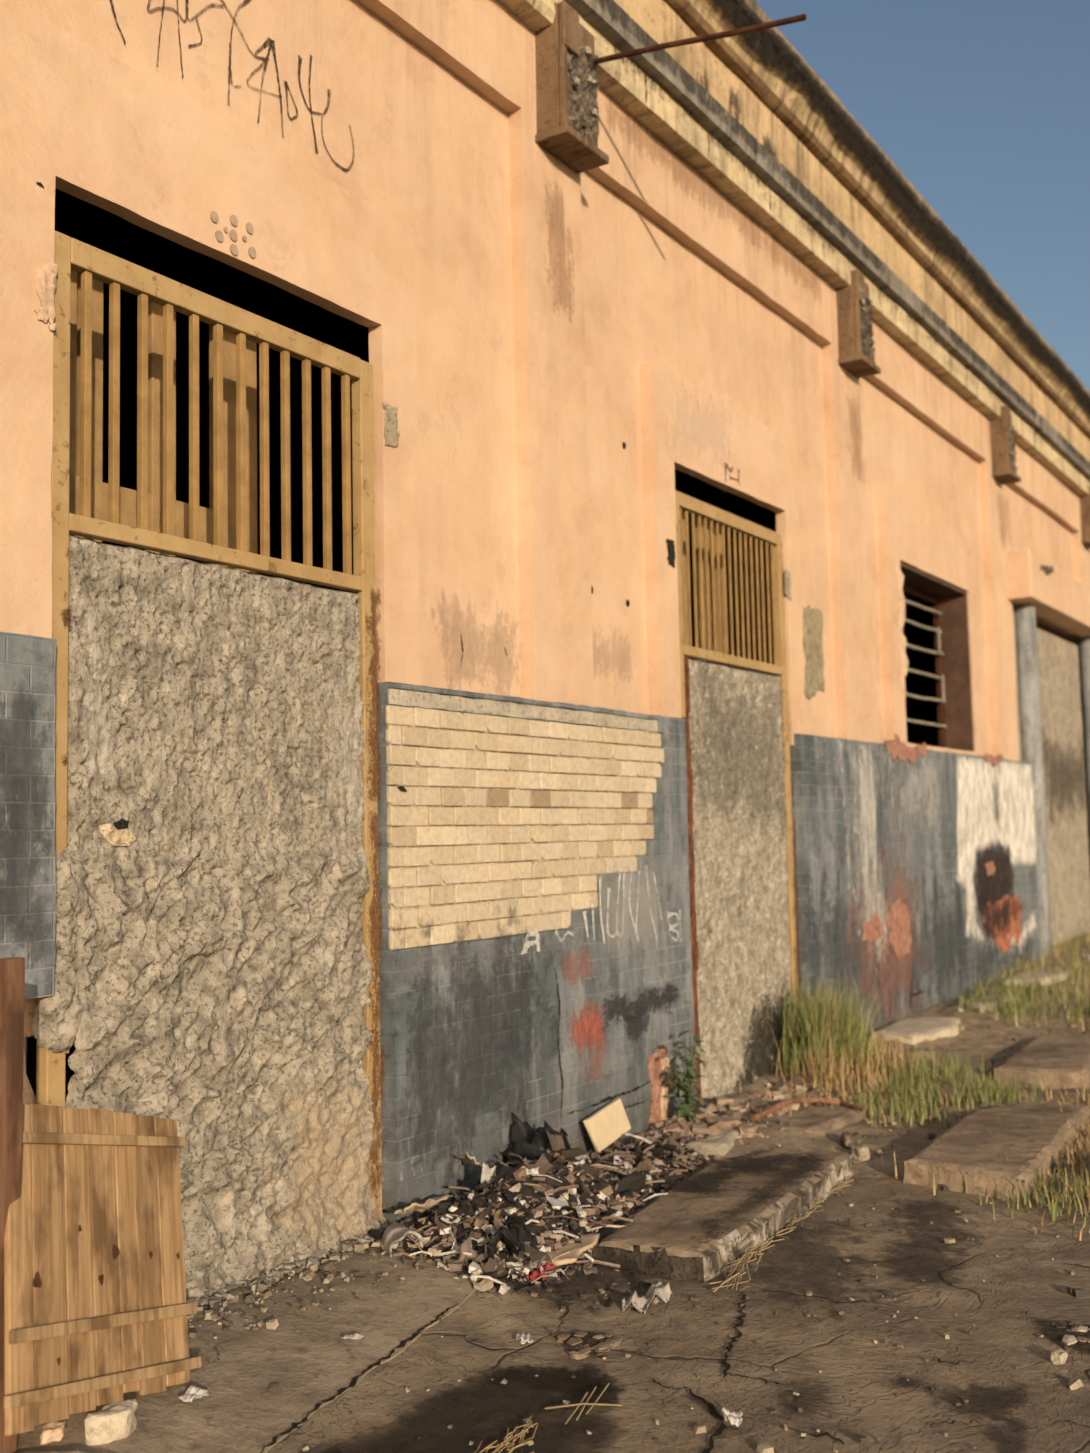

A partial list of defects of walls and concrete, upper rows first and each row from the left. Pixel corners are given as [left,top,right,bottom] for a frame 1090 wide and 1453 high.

damp [600,0,885,271]
damp [714,0,1090,417]
spalling [885,733,926,765]
spalling [862,898,912,960]
spalling [983,894,1022,953]
flaking render [23,998,37,1104]
crack [649,1288,789,1453]